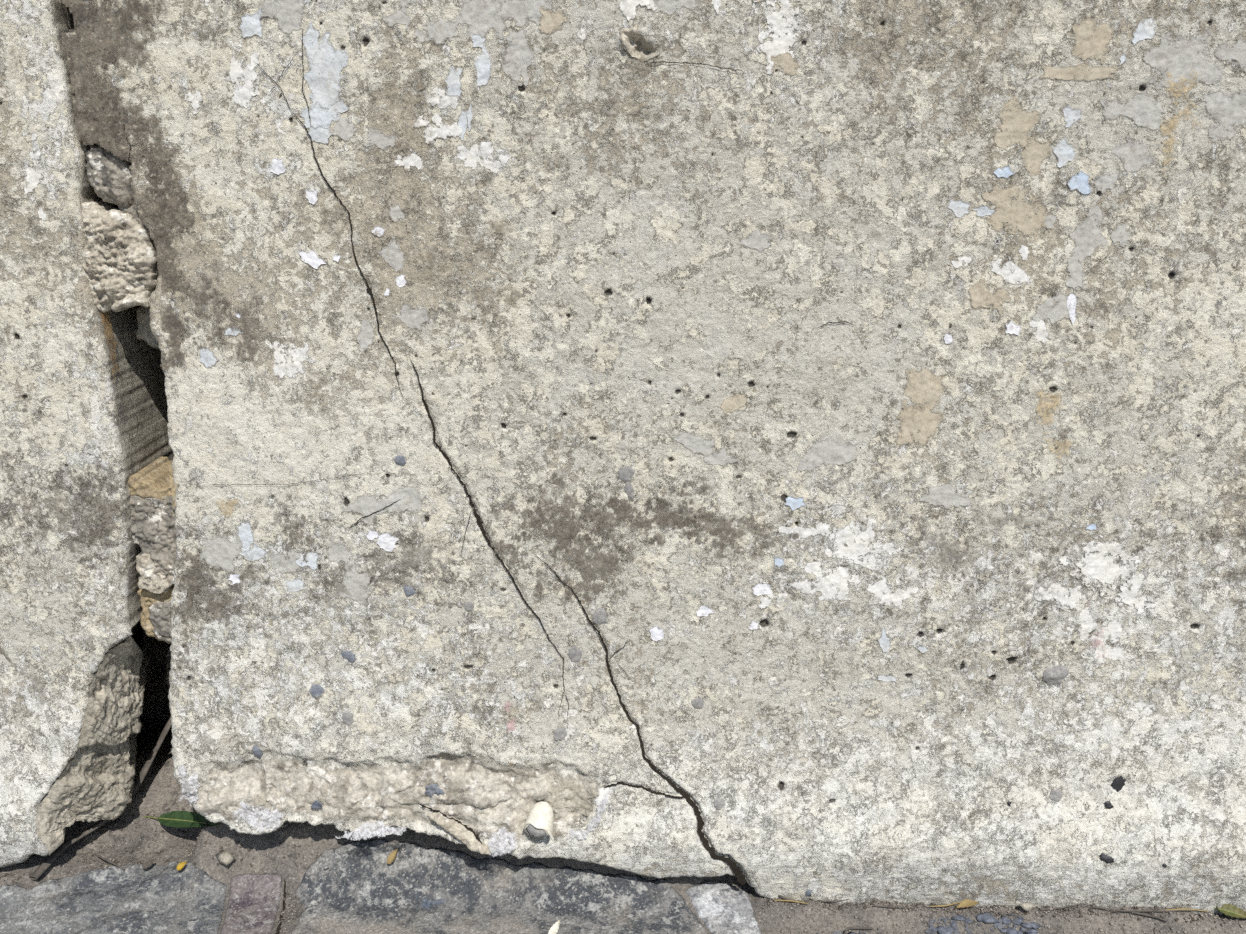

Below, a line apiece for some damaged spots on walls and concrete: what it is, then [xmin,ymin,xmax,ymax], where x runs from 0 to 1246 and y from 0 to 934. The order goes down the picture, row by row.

peeling [230,51,261,110]
peeling [300,0,534,173]
spalling [619,0,721,61]
crack [647,61,741,71]
peeling [753,0,800,75]
peeling [298,250,341,269]
peeling [371,204,409,296]
crack [258,28,569,716]
spalling [36,553,172,855]
crack [535,554,760,885]
spalling [177,753,612,855]
crack [418,803,484,846]